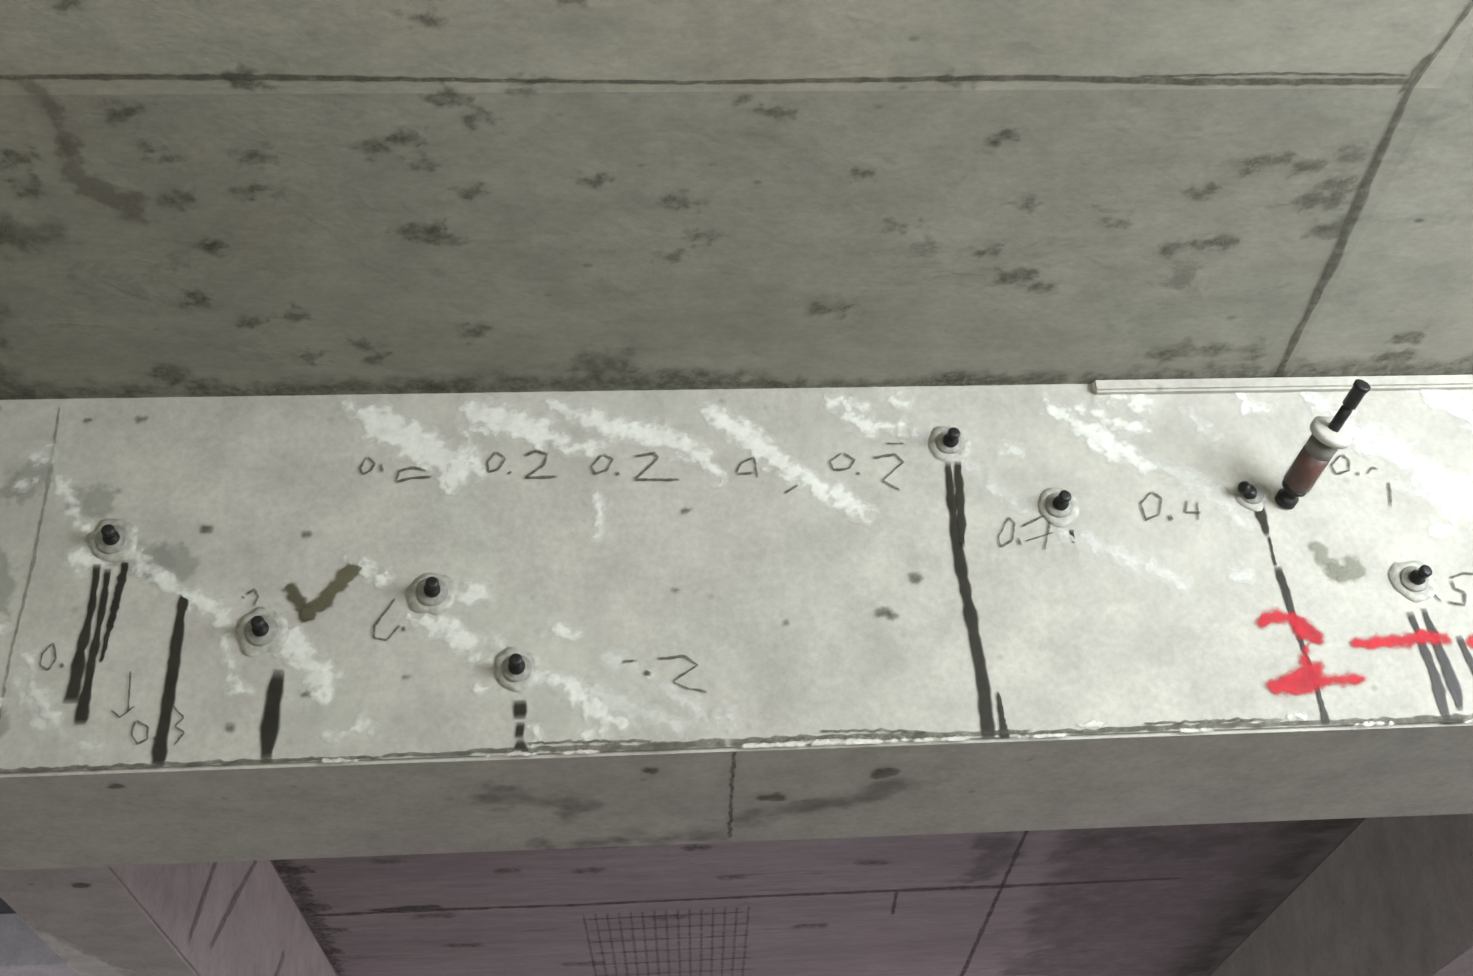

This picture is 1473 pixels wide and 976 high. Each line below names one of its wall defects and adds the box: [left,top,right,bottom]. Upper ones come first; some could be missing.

crack [0,0,1473,374]
damp [1246,154,1354,237]
damp [0,370,66,399]
damp [153,368,367,396]
damp [388,358,778,394]
damp [920,375,1120,386]
damp [1220,335,1473,378]
crack [3,409,59,691]
crack [0,713,1473,835]